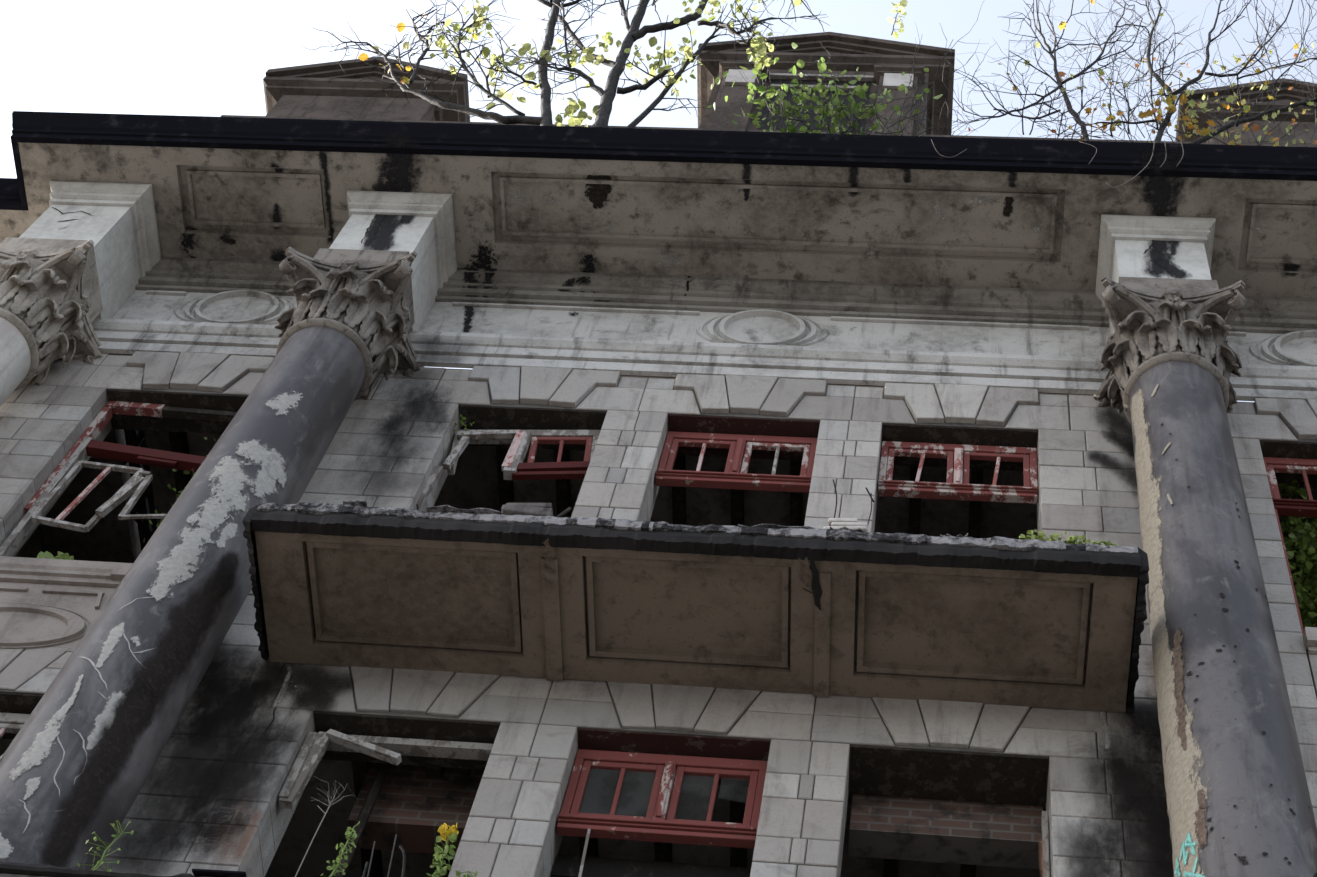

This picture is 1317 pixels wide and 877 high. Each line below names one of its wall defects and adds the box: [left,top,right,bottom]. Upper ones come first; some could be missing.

damp [364,132,421,251]
damp [1133,146,1190,279]
damp [1284,264,1300,276]
peeling [0,622,141,800]
crack [81,657,108,700]
crack [119,597,154,665]
peeling [146,384,1225,877]
crack [20,729,87,833]
peeling [0,832,14,859]